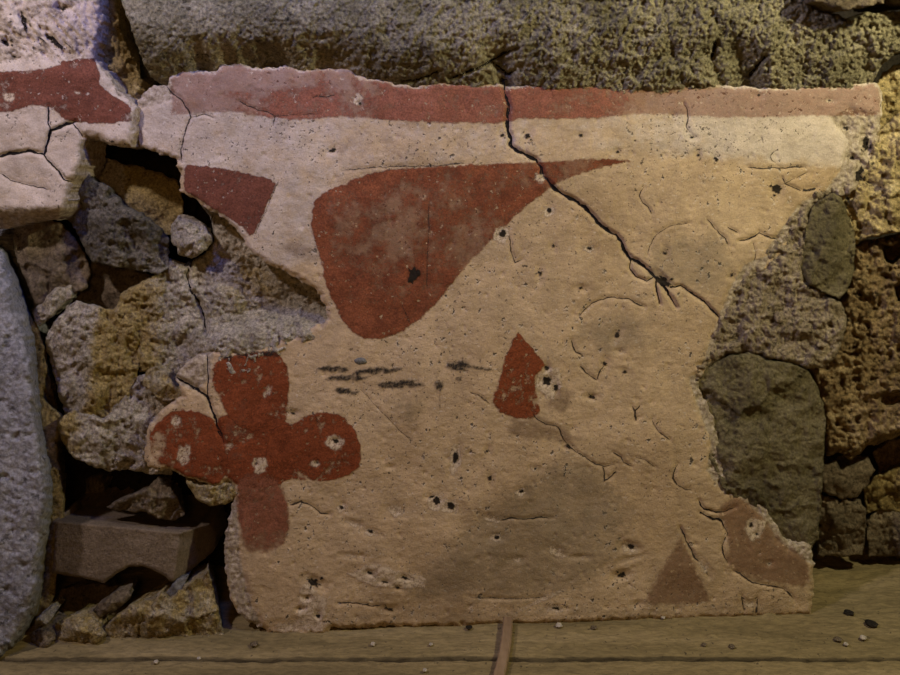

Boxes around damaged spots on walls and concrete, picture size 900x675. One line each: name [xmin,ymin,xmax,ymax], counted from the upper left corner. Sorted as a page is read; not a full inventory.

crack [0,106,83,190]
crack [403,48,775,317]
spalling [114,199,328,377]
spalling [695,191,847,381]
crack [177,356,224,442]
spalling [177,445,190,465]
spalling [252,458,268,474]
spalling [745,519,766,541]